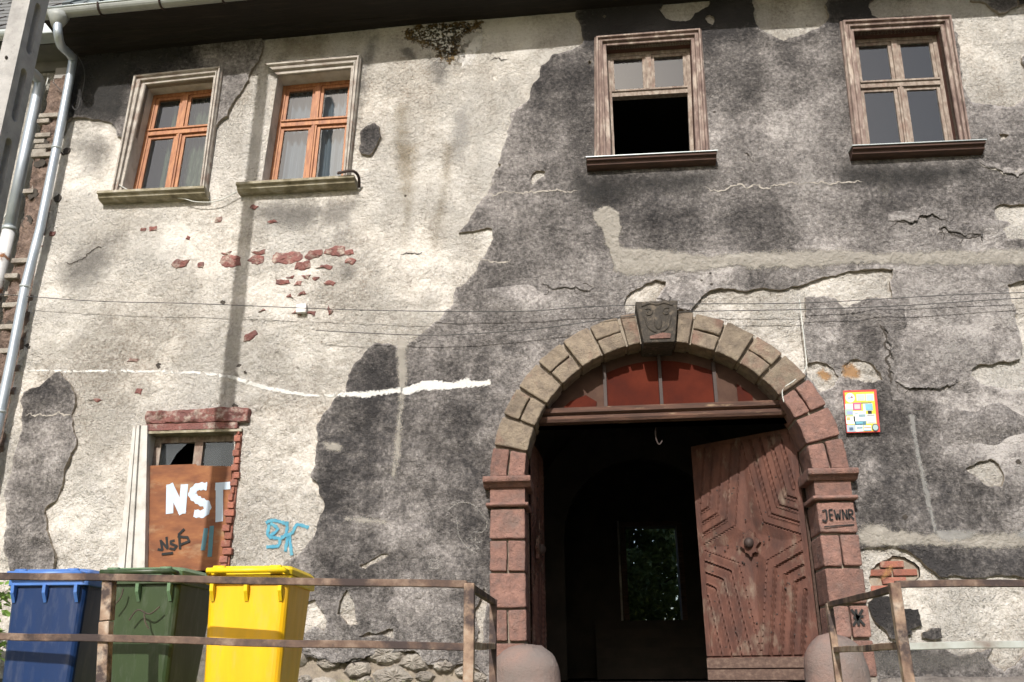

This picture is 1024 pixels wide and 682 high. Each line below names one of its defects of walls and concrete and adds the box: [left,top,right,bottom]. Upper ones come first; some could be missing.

peeling [660,1,714,25]
peeling [752,0,828,41]
peeling [869,0,1024,107]
crack [704,148,861,192]
crack [891,215,983,243]
peeling [994,205,1024,239]
peeling [0,12,583,682]
peeling [624,270,893,392]
crack [880,325,934,400]
peeling [971,281,1024,391]
peeling [966,460,1003,487]
peeling [860,546,1024,671]